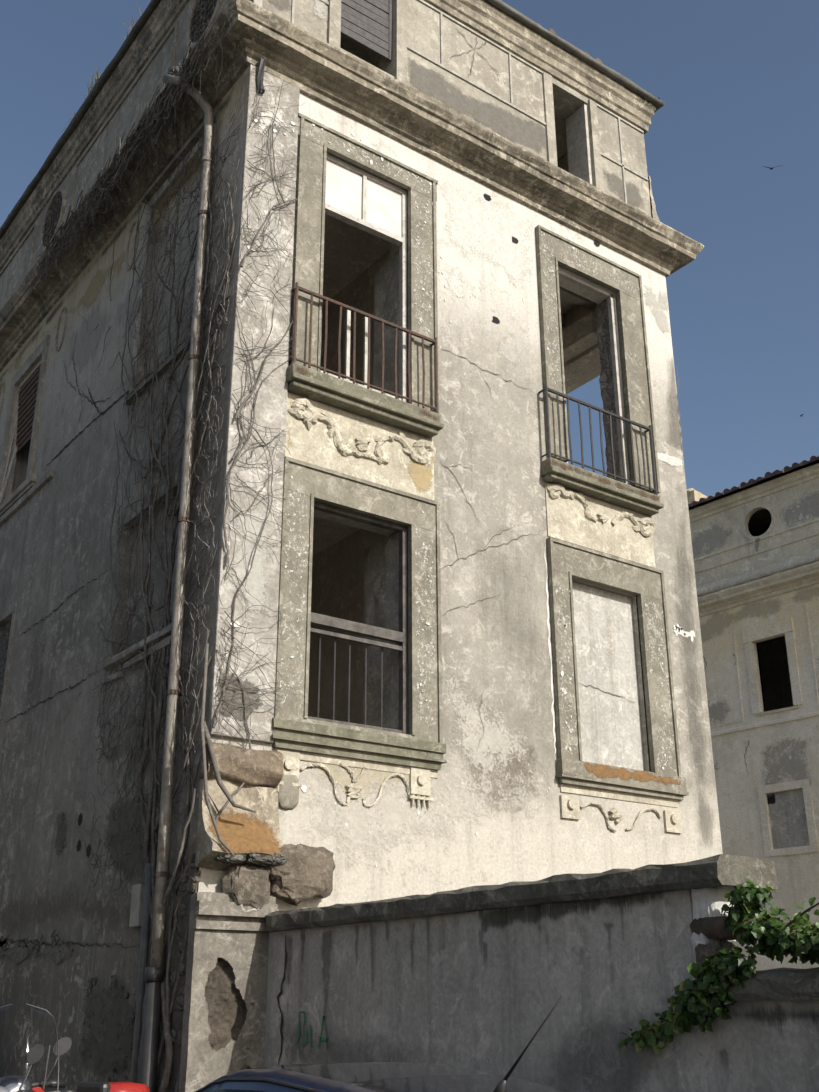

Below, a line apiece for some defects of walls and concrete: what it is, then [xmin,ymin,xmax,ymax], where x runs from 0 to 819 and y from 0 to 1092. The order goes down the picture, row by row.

crack [448,26,499,78]
water stain [410,60,547,151]
crack [436,457,543,568]
spalling [217,669,263,721]
peeling [213,679,550,913]
corrosion [585,763,681,785]
peeling [761,739,811,804]
crack [8,938,140,948]
water stain [482,892,662,929]
spalling [204,957,255,1051]
crack [277,937,287,1065]